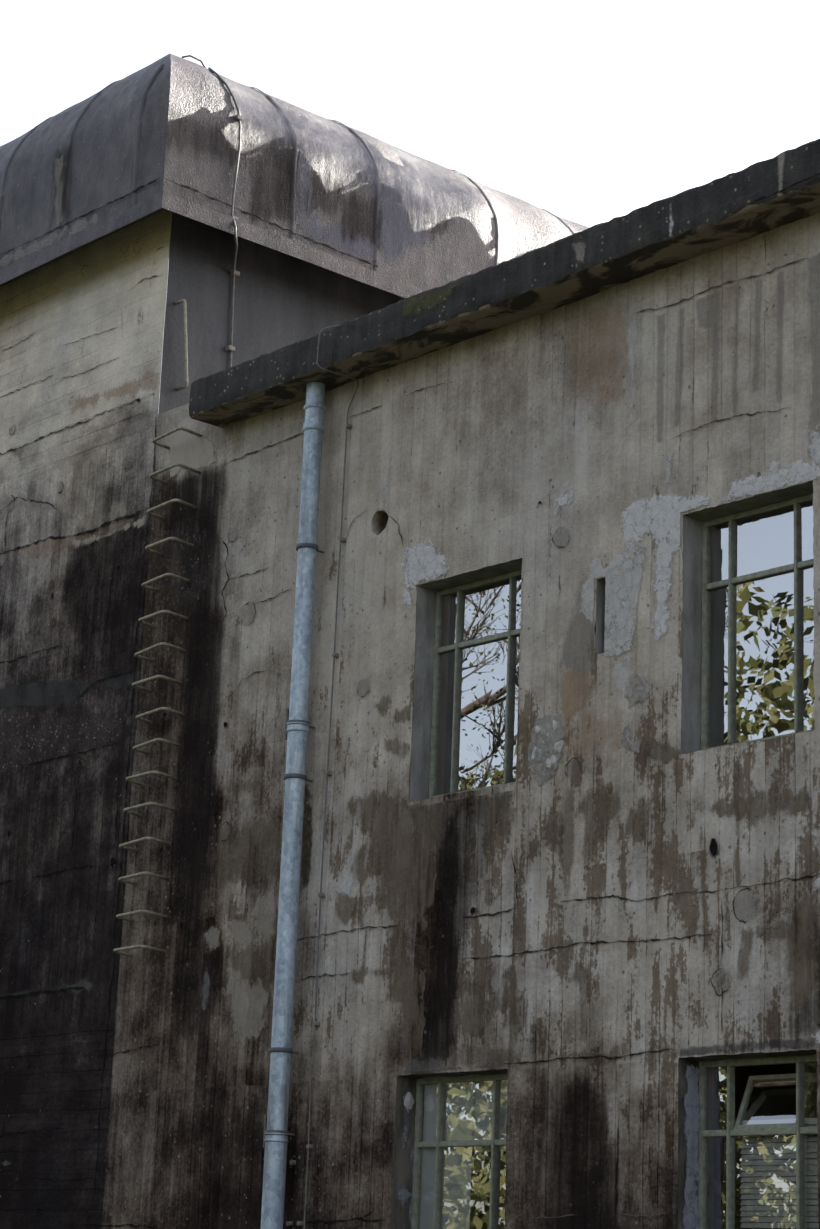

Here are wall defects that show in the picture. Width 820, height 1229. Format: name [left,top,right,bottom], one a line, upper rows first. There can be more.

damp [251,144,294,221]
damp [311,175,381,240]
crack [1,328,123,397]
spalling [528,714,565,786]
crack [0,394,181,1229]
damp [301,786,312,887]
damp [548,785,649,888]
damp [335,789,528,1072]
damp [738,893,816,1008]